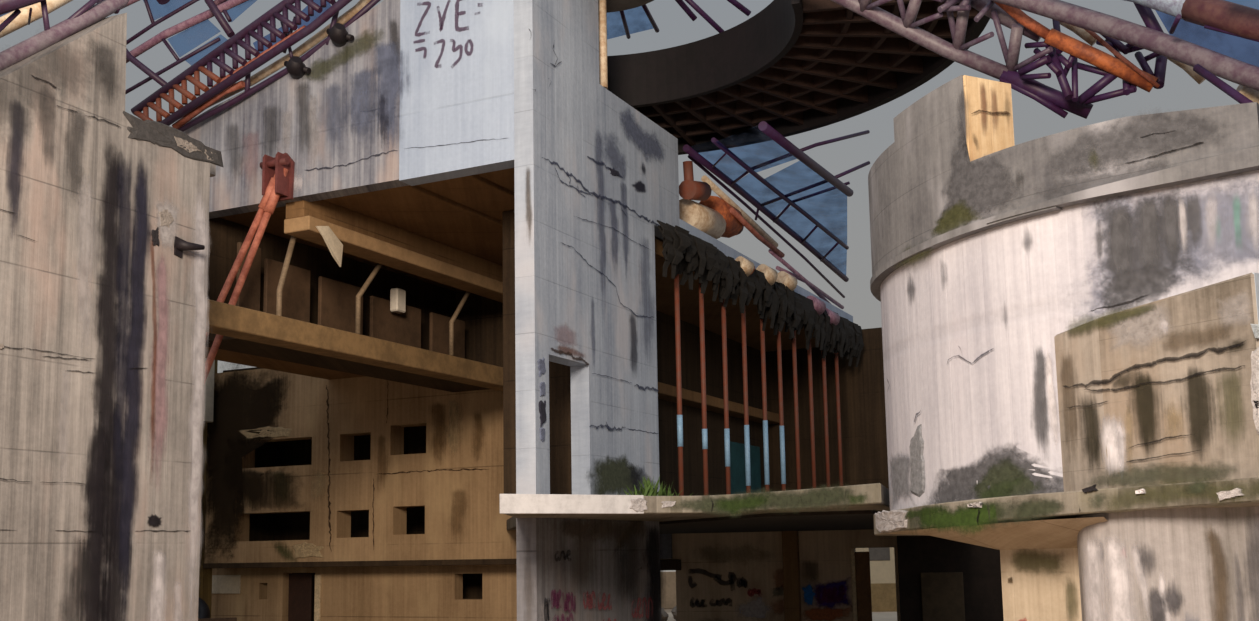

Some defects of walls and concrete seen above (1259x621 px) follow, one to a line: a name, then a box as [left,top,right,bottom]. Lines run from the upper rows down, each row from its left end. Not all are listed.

leakage [7,102,24,224]
crack [542,156,660,318]
leakage [1097,194,1259,312]
crack [1091,294,1149,311]
crack [0,343,94,373]
leakage [67,113,151,621]
leakage [190,209,289,583]
crack [1064,342,1243,408]
spalling [1250,346,1259,435]
leakage [933,447,1064,504]
crack [1127,435,1199,462]
leakage [1085,540,1182,621]